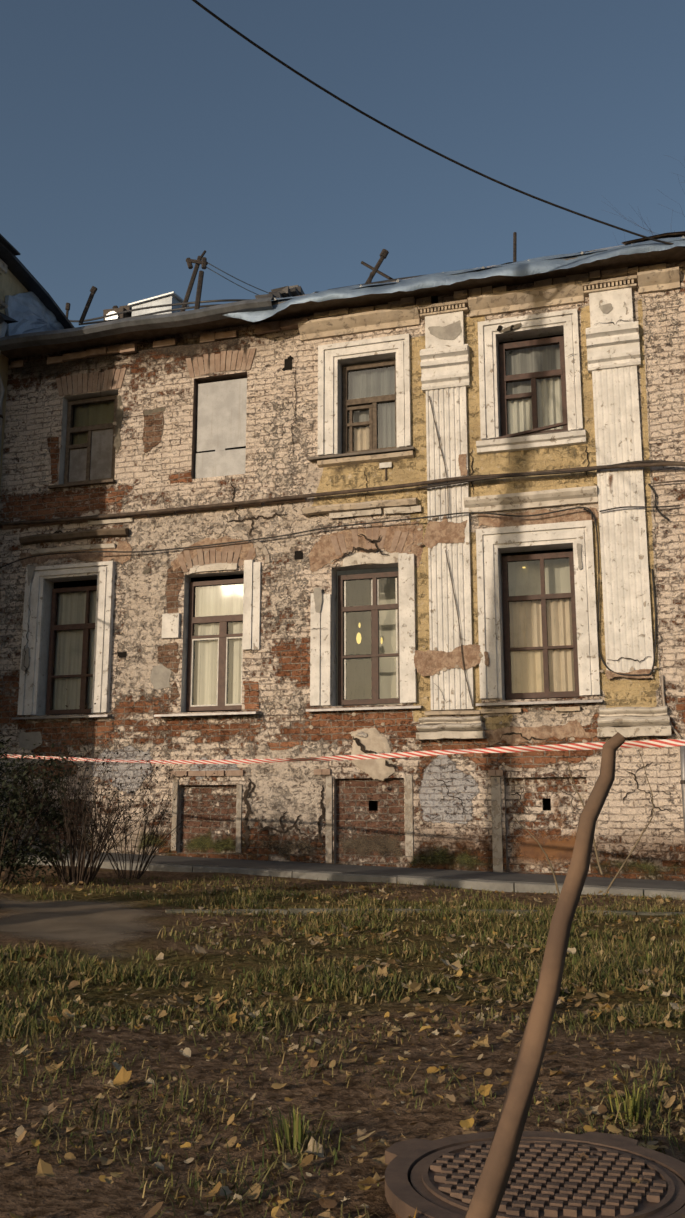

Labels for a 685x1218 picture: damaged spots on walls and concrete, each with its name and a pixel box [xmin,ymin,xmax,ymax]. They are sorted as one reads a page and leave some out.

flaking render [47,433,61,484]
spalling [113,395,124,455]
spalling [140,407,165,456]
spalling [18,540,132,586]
spalling [161,533,256,614]
spalling [294,504,598,572]
flaking render [281,650,310,684]
spalling [410,644,490,677]
flaking render [167,680,263,735]
flaking render [676,697,685,712]
flaking render [267,711,411,789]
crack [243,779,326,853]